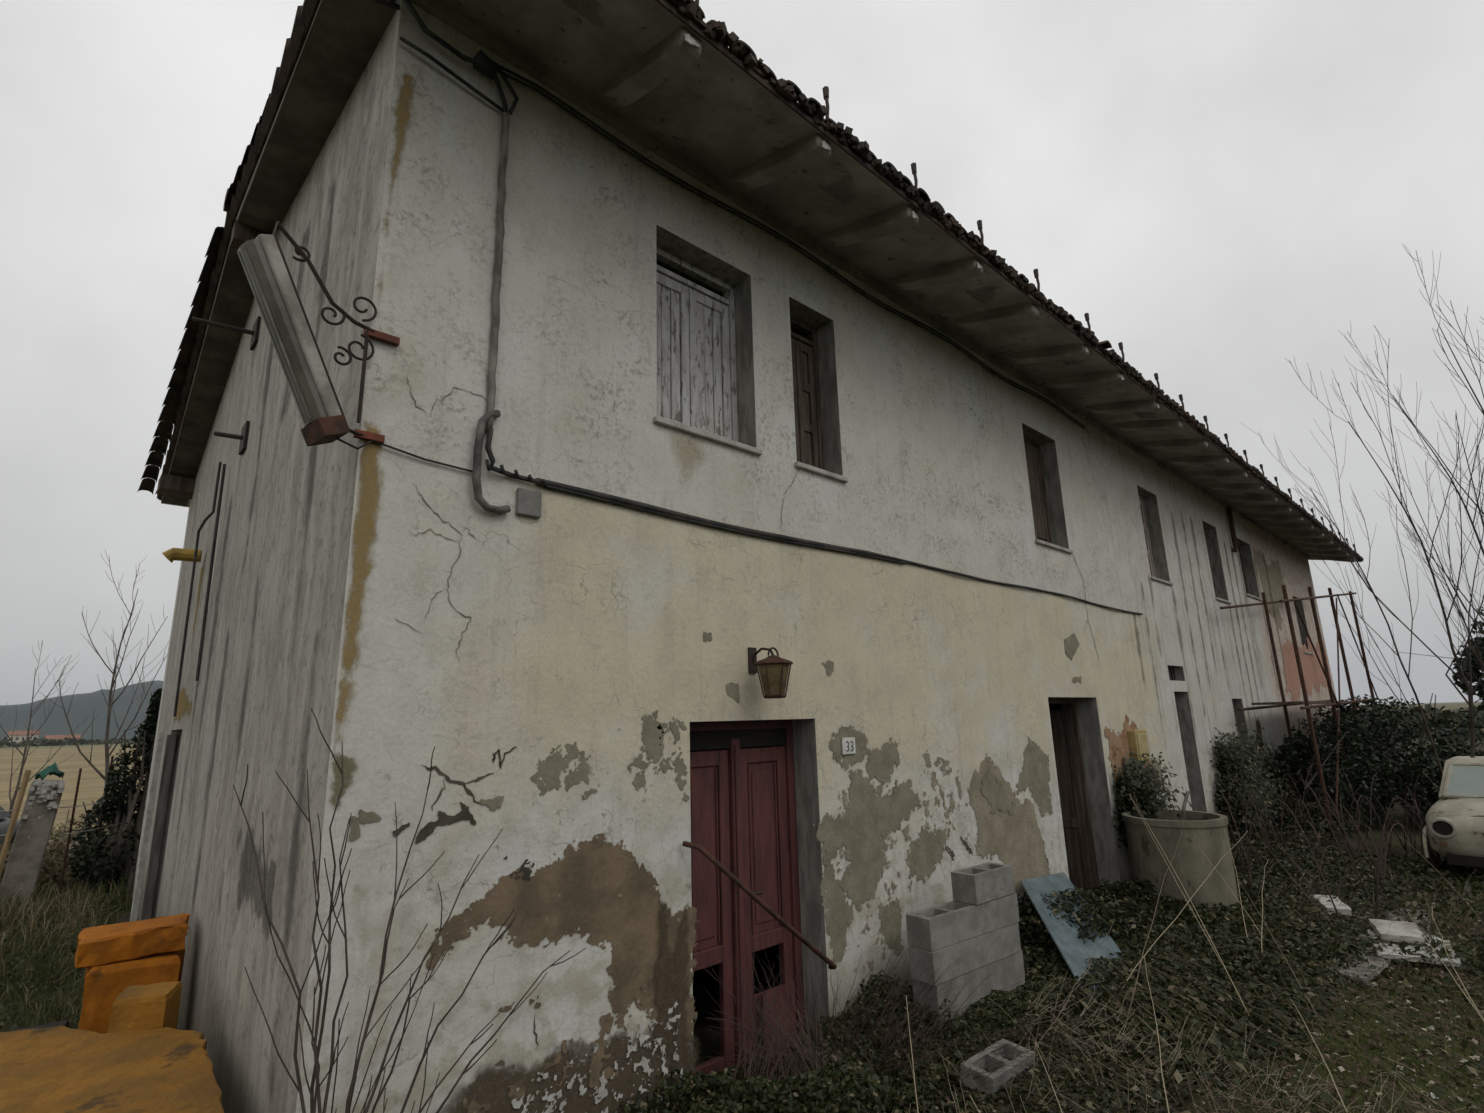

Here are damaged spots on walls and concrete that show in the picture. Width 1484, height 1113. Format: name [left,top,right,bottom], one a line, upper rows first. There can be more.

crack [396,484,479,663]
crack [422,765,494,811]
peeling [530,741,599,800]
peeling [627,710,689,802]
flaking render [1104,714,1163,788]
peeling [813,725,1053,972]
flaking render [426,833,699,1113]